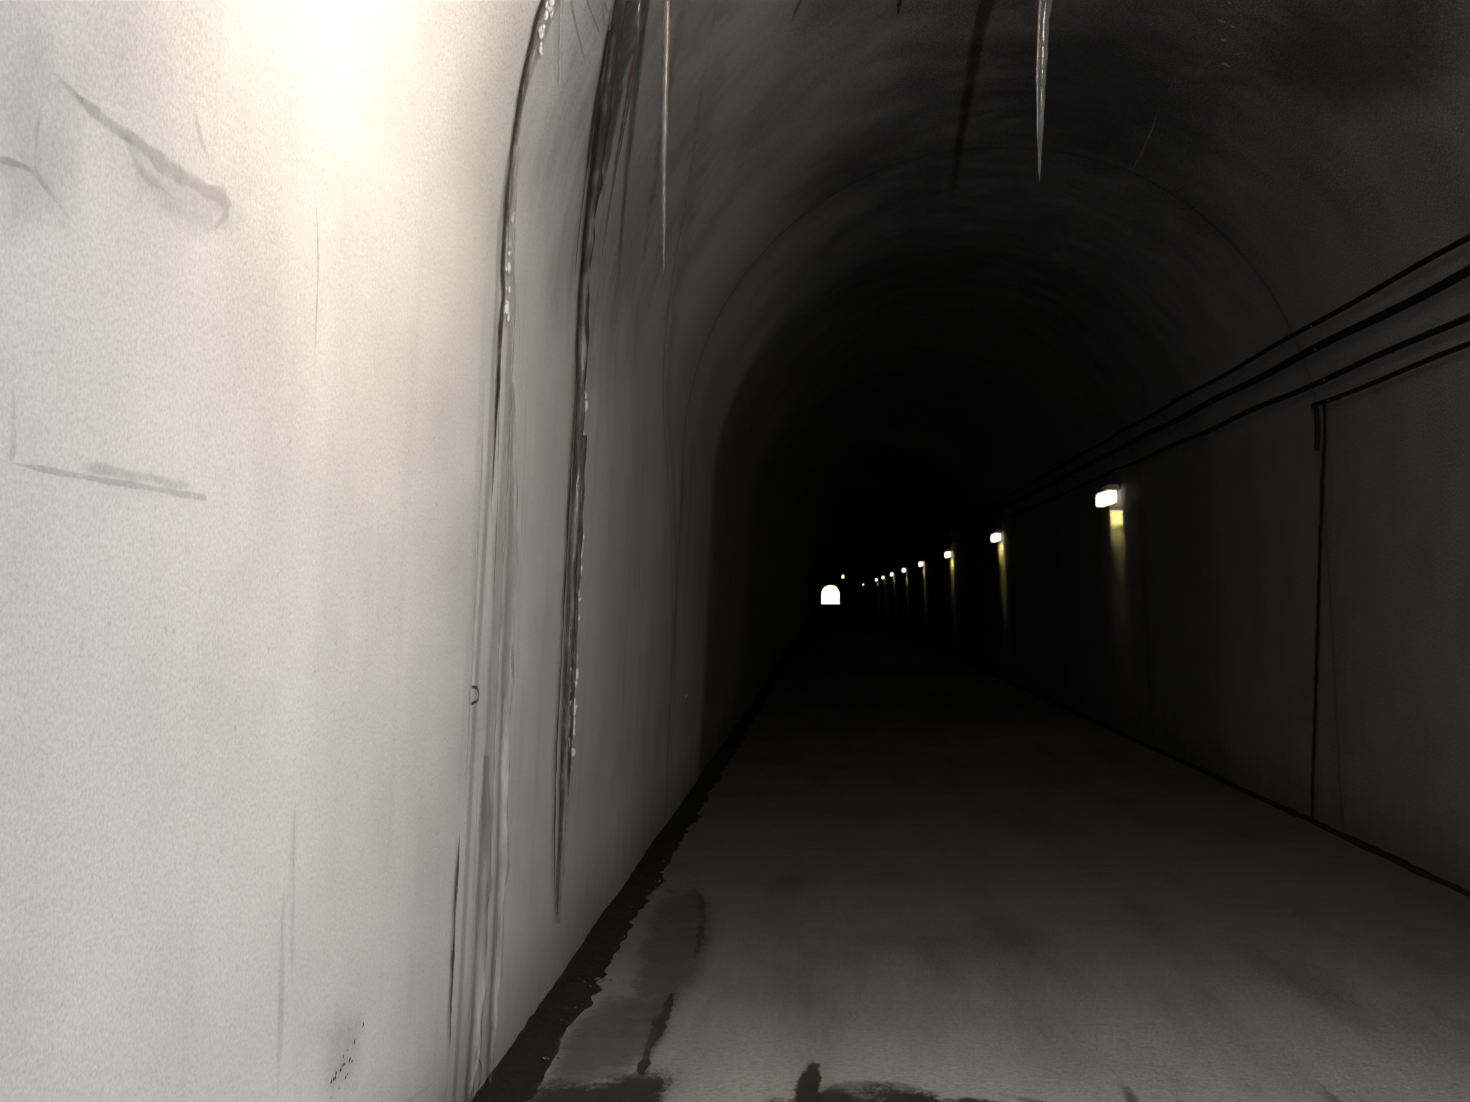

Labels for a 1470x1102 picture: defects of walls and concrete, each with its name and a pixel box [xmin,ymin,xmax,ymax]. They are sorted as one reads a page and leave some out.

water stain [554,0,644,889]
water stain [771,1062,1002,1102]